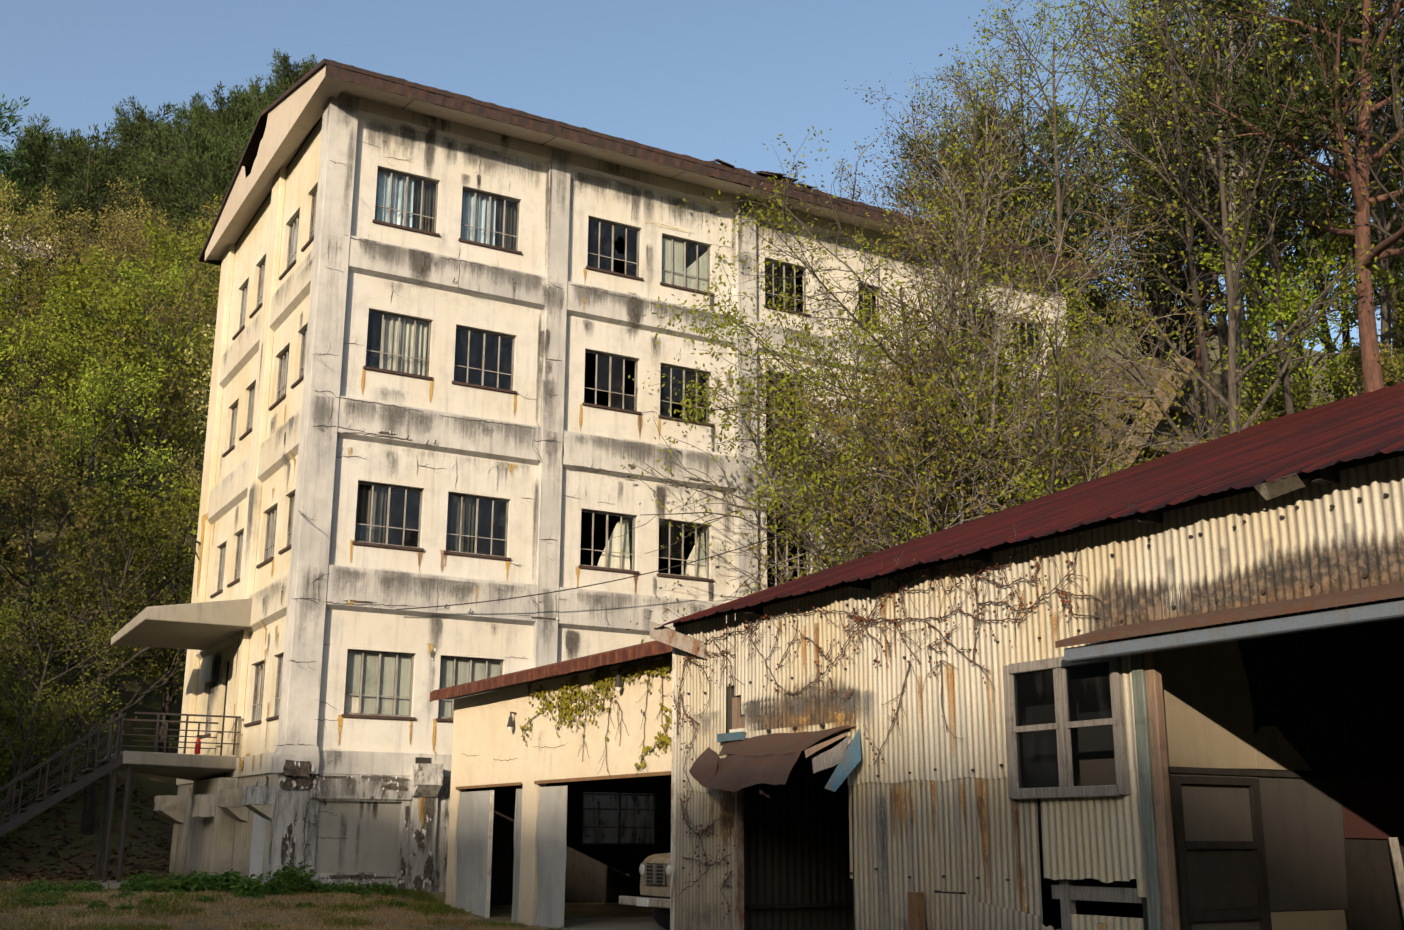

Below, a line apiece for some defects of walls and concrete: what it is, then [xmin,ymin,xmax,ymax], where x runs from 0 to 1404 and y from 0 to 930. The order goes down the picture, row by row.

damp [369,116,552,226]
damp [386,406,410,431]
corrosion [802,623,819,683]
corrosion [881,591,896,656]
damp [1087,532,1404,632]
damp [745,678,872,731]
peeling [242,754,434,891]
corrosion [890,780,935,838]
corrosion [960,777,989,879]
corrosion [1012,799,1028,912]